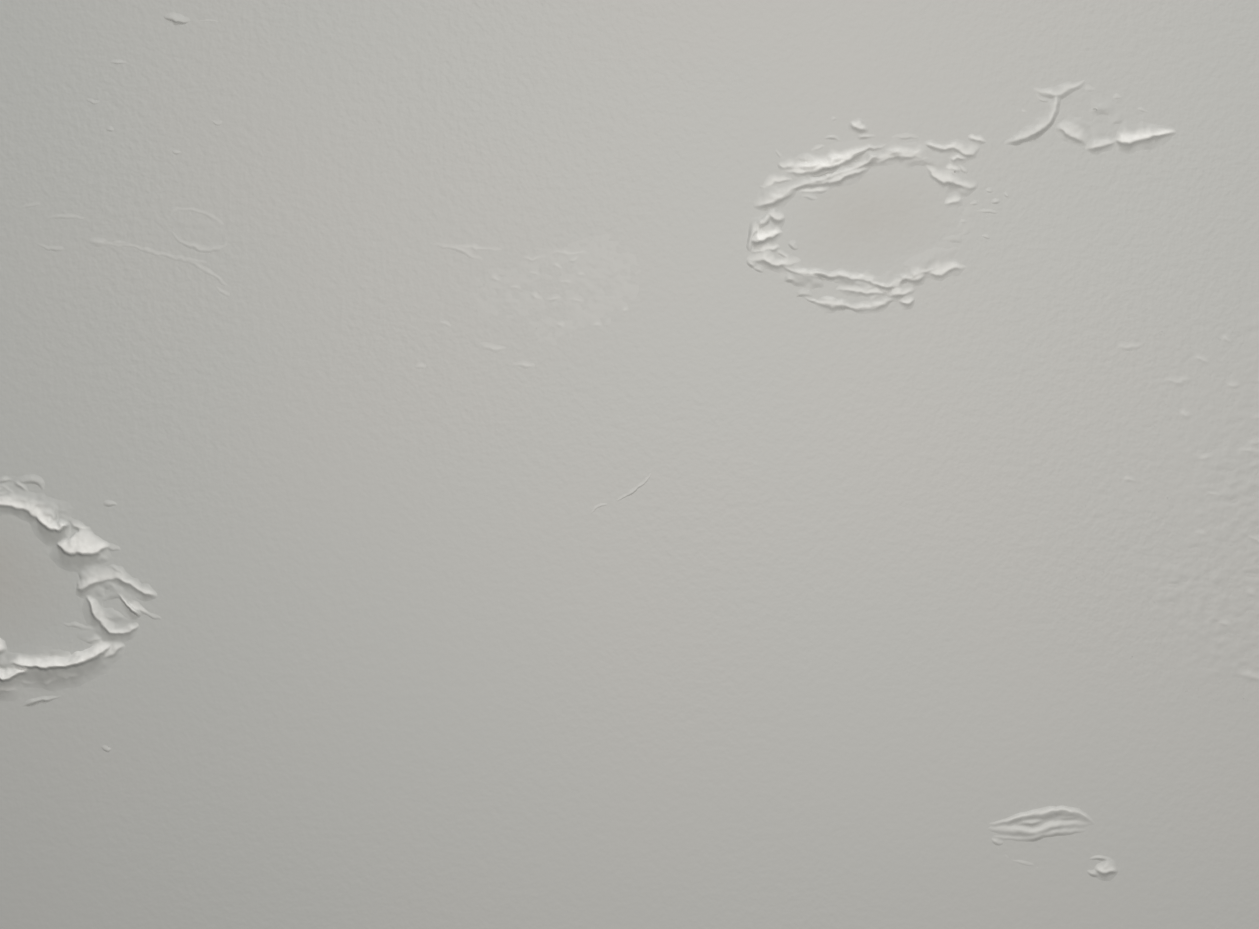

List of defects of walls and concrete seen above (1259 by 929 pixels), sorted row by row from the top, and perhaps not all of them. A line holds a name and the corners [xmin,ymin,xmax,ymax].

peeling [746,116,1009,314]
peeling [0,474,162,707]